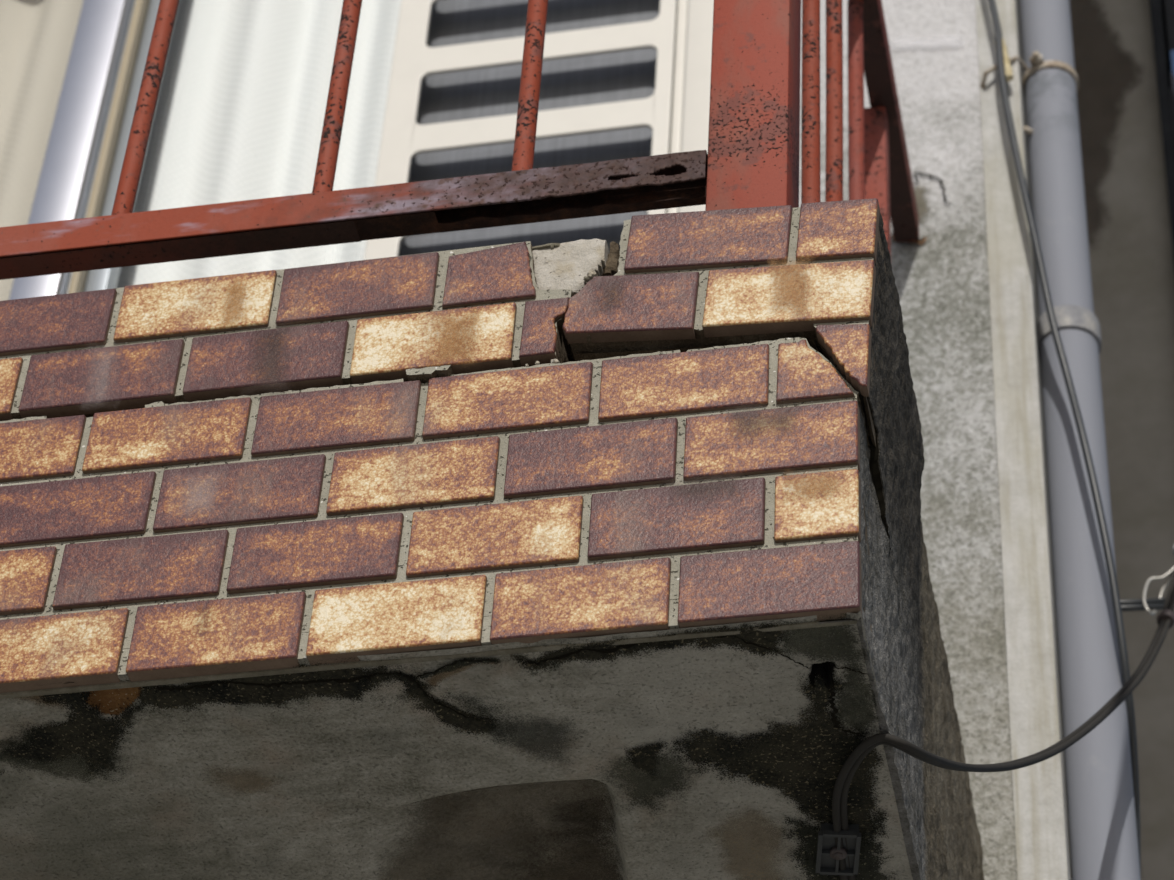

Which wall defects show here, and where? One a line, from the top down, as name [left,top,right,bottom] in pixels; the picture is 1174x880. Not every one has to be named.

leakage [1069,0,1141,245]
spalling [532,239,620,295]
crack [145,400,165,408]
crack [406,365,454,383]
crack [525,328,727,367]
crack [807,340,820,353]
crack [859,395,891,554]
crack [144,641,665,722]
crack [713,635,867,738]
leakage [0,613,898,880]